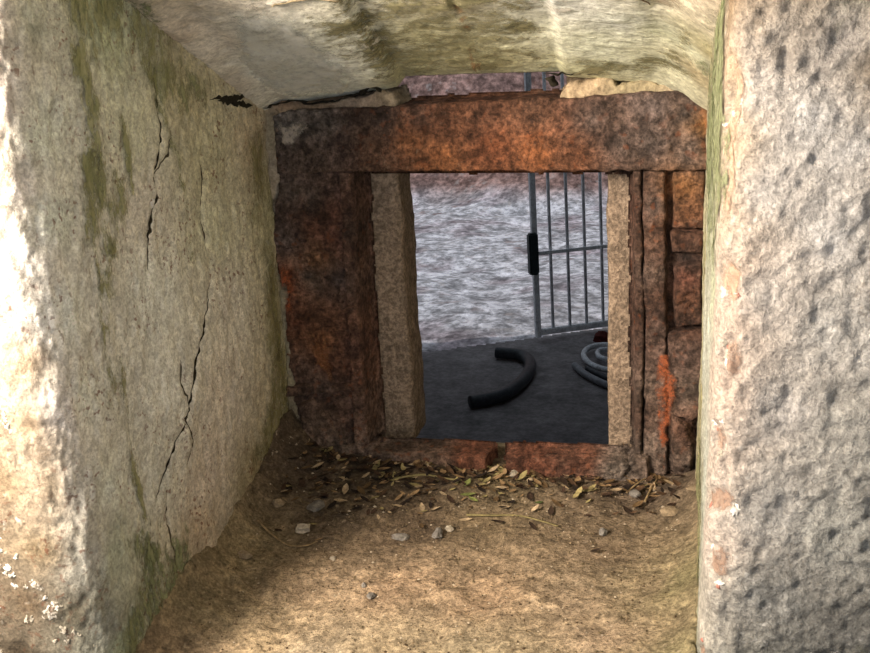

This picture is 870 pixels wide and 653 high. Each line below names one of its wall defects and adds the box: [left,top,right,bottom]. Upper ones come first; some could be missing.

leakage [345,0,394,80]
leakage [506,3,534,40]
leakage [70,37,106,208]
leakage [119,115,134,195]
crack [156,284,210,573]
corrosion [656,355,675,445]